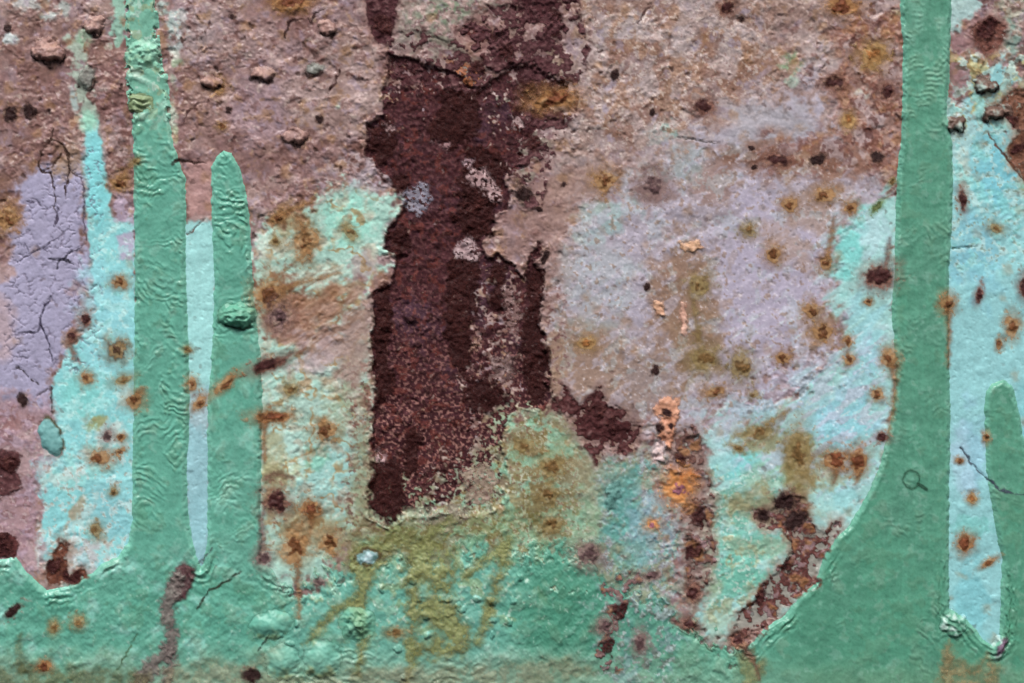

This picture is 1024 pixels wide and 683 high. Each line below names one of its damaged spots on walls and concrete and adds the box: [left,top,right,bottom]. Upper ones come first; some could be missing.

crack [17,128,87,269]
peeling [364,0,641,535]
peeling [679,239,704,252]
rust [862,243,899,306]
crack [28,301,53,361]
rust [68,309,94,385]
rust [107,337,132,361]
peeling [680,302,688,336]
rust [801,302,856,366]
rust [89,428,126,469]
peeling [651,396,717,601]
crack [960,447,1024,495]